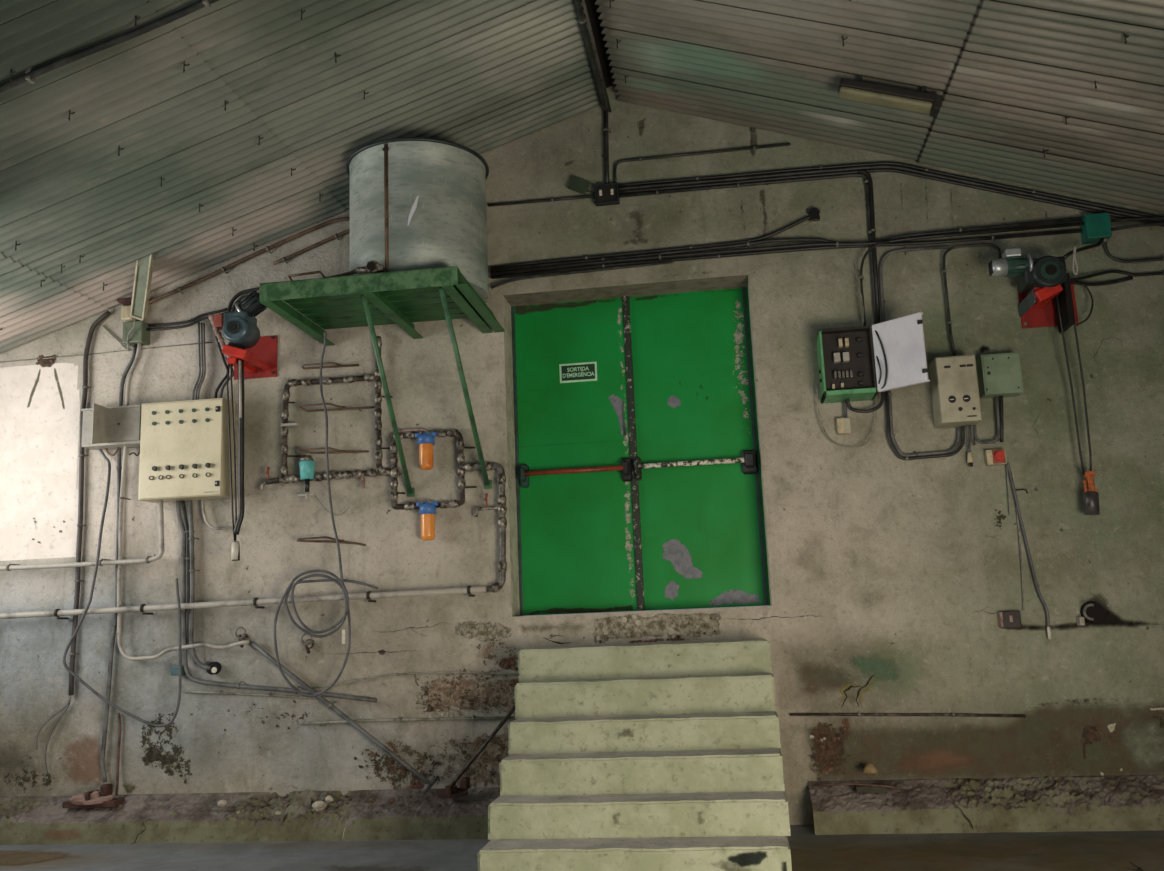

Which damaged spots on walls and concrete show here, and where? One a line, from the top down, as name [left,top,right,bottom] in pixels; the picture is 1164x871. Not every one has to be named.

peeling [608,394,626,436]
peeling [662,539,703,600]
spalling [593,589,761,643]
peeling [414,668,519,718]
flaking render [354,728,509,788]
leakage [809,699,1164,779]